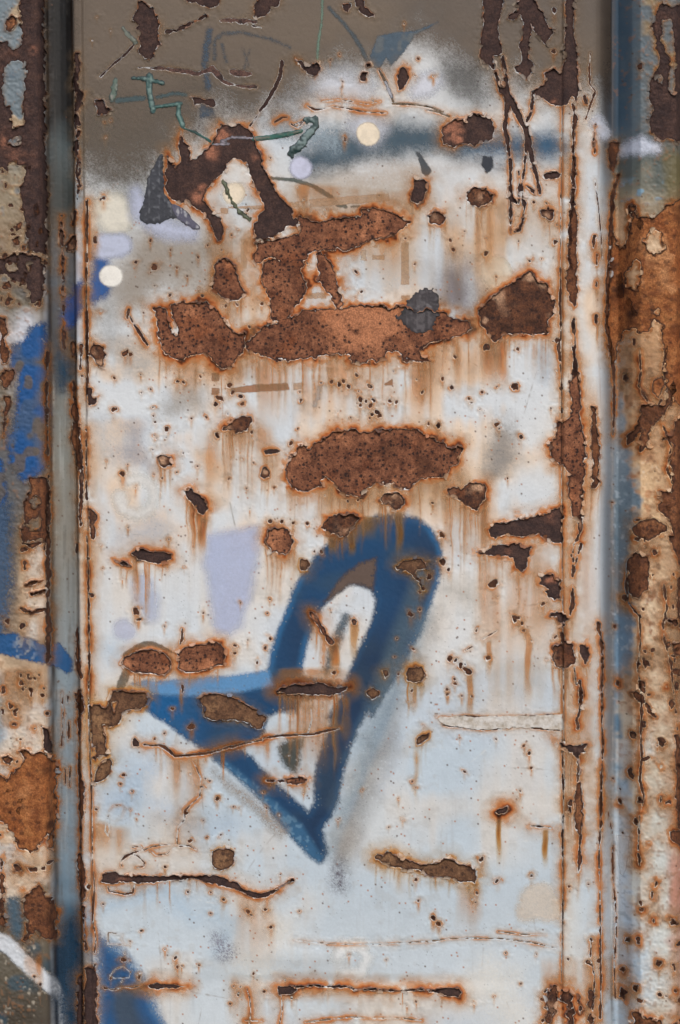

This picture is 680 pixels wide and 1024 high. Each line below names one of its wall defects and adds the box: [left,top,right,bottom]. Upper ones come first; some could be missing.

corrosion [0,0,249,1024]
corrosion [137,0,680,1024]